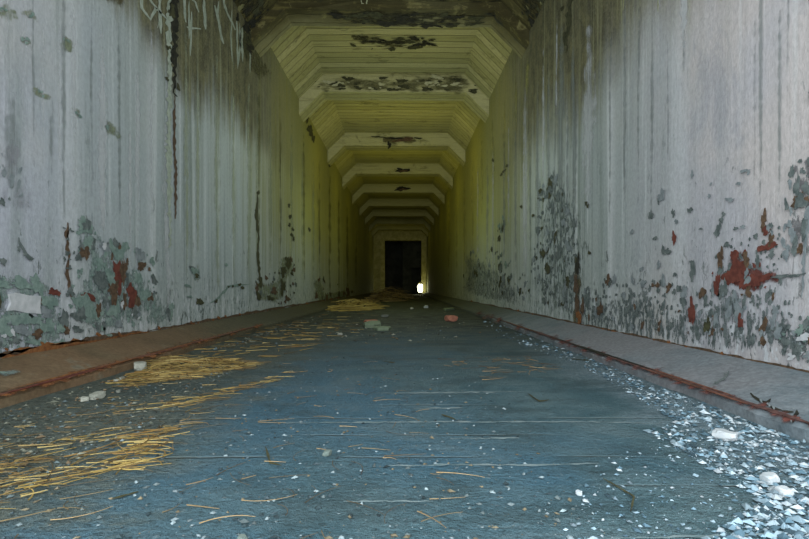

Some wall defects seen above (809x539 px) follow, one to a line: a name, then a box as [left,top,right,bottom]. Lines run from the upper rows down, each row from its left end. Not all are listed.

leakage [556,59,596,212]
peeling [0,216,175,353]
corrosion [0,296,344,359]
peeling [185,266,204,305]
peeling [255,256,297,304]
peeling [463,157,809,363]
corrosion [470,252,809,424]